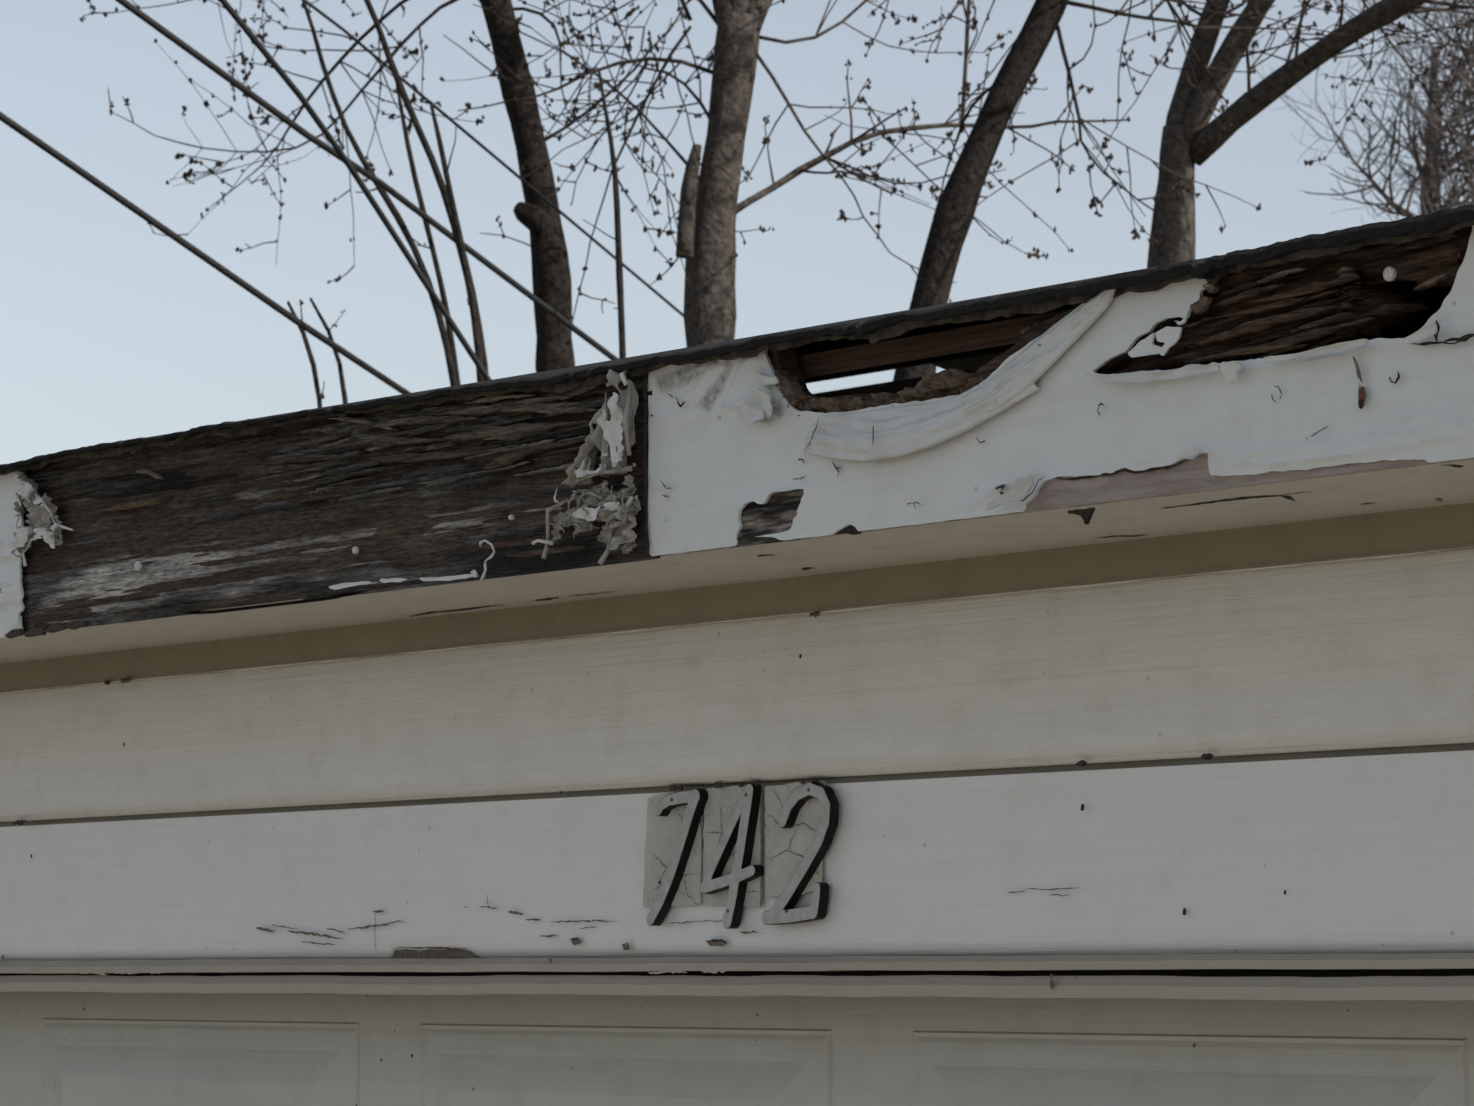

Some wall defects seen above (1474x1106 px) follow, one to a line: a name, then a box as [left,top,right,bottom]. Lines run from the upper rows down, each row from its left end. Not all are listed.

peeling [803,289,1116,476]
peeling [1128,317,1187,358]
peeling [1220,362,1244,380]
peeling [11,470,73,566]
peeling [531,369,648,565]
peeling [731,489,804,548]
peeling [985,448,1439,525]
peeling [328,539,496,590]